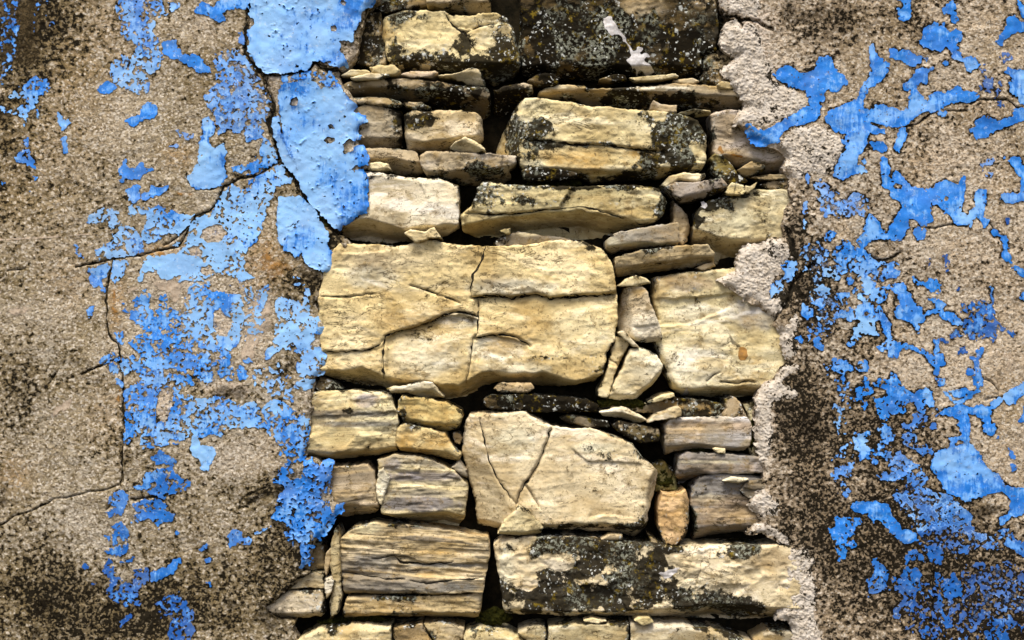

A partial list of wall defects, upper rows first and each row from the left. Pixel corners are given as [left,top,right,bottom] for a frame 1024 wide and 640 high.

crack [1,3,343,525]
peeling [155,594,196,640]
peeling [74,0,376,628]
crack [480,423,552,507]
peeling [715,0,1024,640]